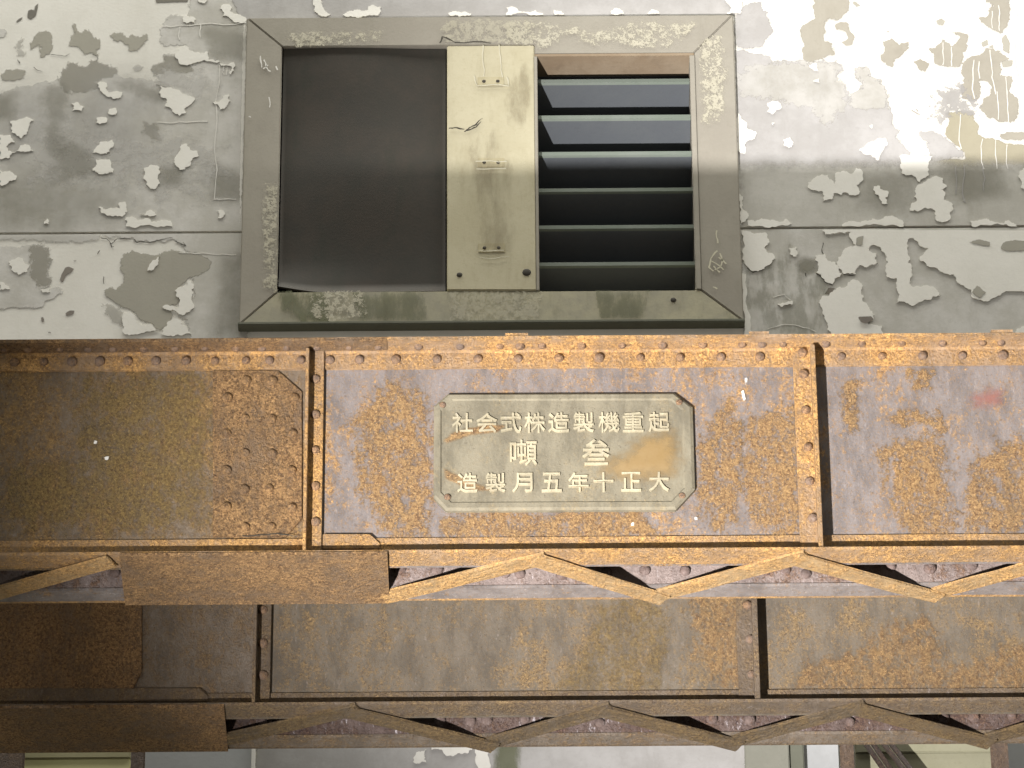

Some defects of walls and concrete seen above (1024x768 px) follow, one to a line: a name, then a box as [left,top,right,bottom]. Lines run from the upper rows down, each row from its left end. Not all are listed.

crack [439,35,489,43]
crack [449,118,483,132]
peeling [0,0,1024,338]
rust [837,380,862,433]
rust [905,367,936,393]
rust [347,380,664,538]
rust [606,437,675,479]
rust [694,397,800,535]
rust [875,406,1024,534]
rust [689,598,738,688]
rust [797,617,1024,689]